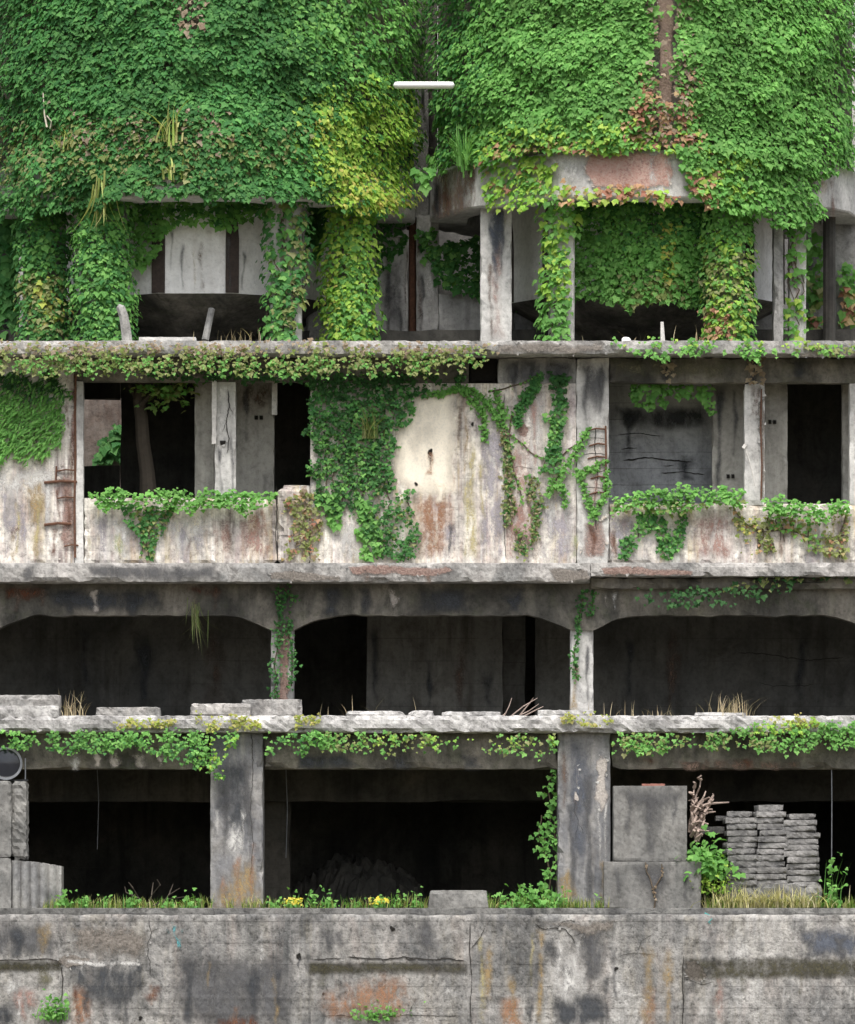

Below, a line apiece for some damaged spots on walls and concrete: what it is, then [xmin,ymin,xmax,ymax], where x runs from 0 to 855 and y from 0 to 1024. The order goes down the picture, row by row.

damp [488,210,504,267]
crack [223,392,232,452]
damp [619,409,703,445]
corrosion [419,502,446,552]
damp [0,927,141,1006]
crack [312,925,485,1018]